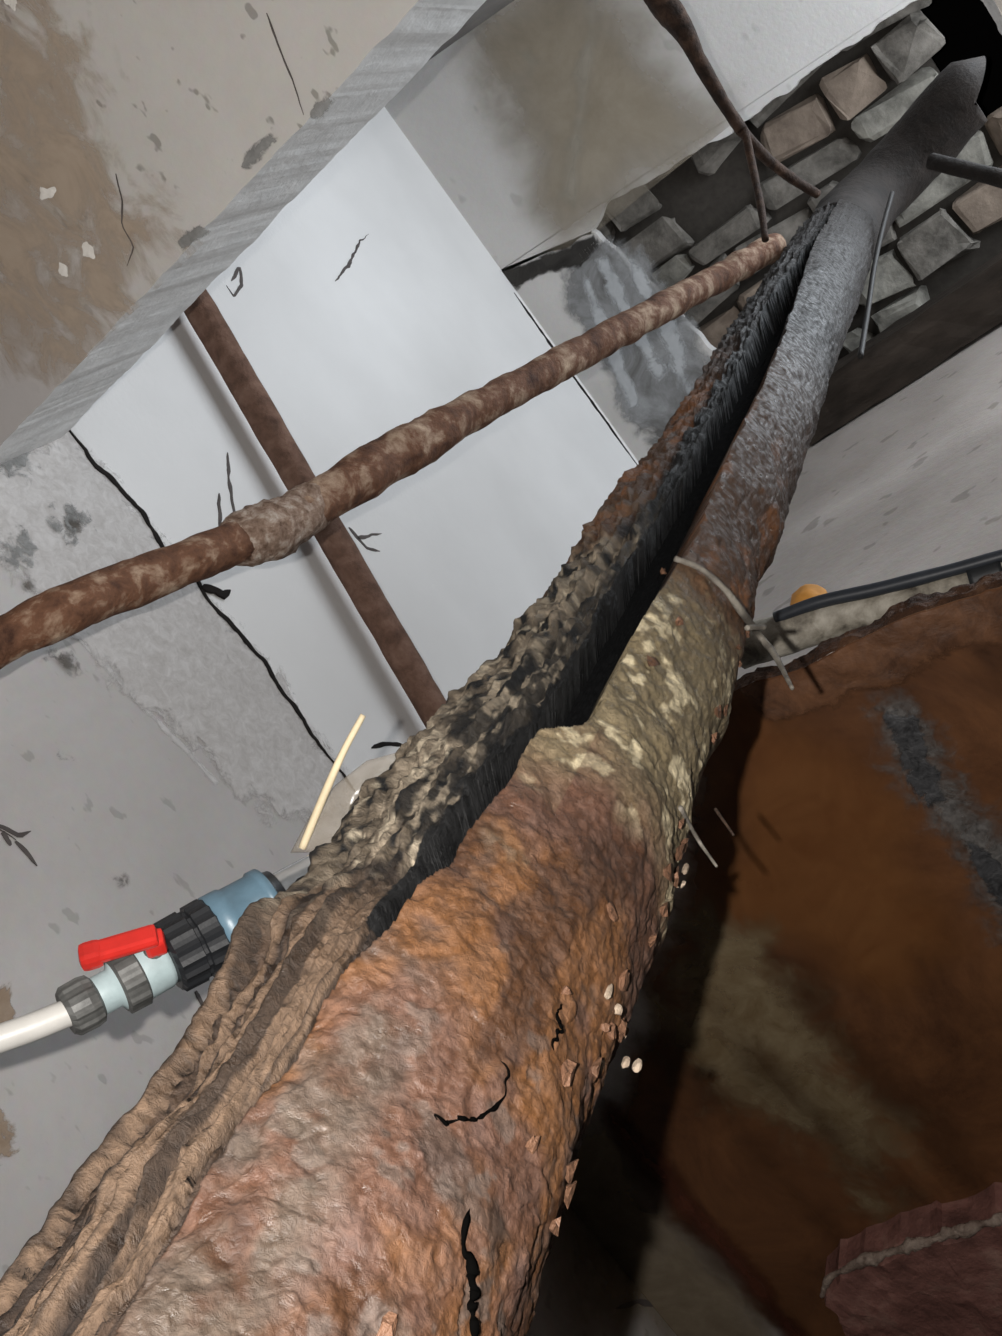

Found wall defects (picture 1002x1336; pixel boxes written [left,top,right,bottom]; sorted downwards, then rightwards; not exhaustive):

water stain [0,0,150,372]
water stain [602,315,711,445]
crack [69,430,165,548]
corrosion [184,289,446,727]
crack [196,581,358,798]
water stain [876,702,1002,913]
peeling [0,987,15,1023]
corrosion [601,586,1002,1336]
peeling [0,1109,18,1157]
crack [434,1061,510,1127]
corrosion [549,1159,579,1236]
crack [461,1209,481,1336]